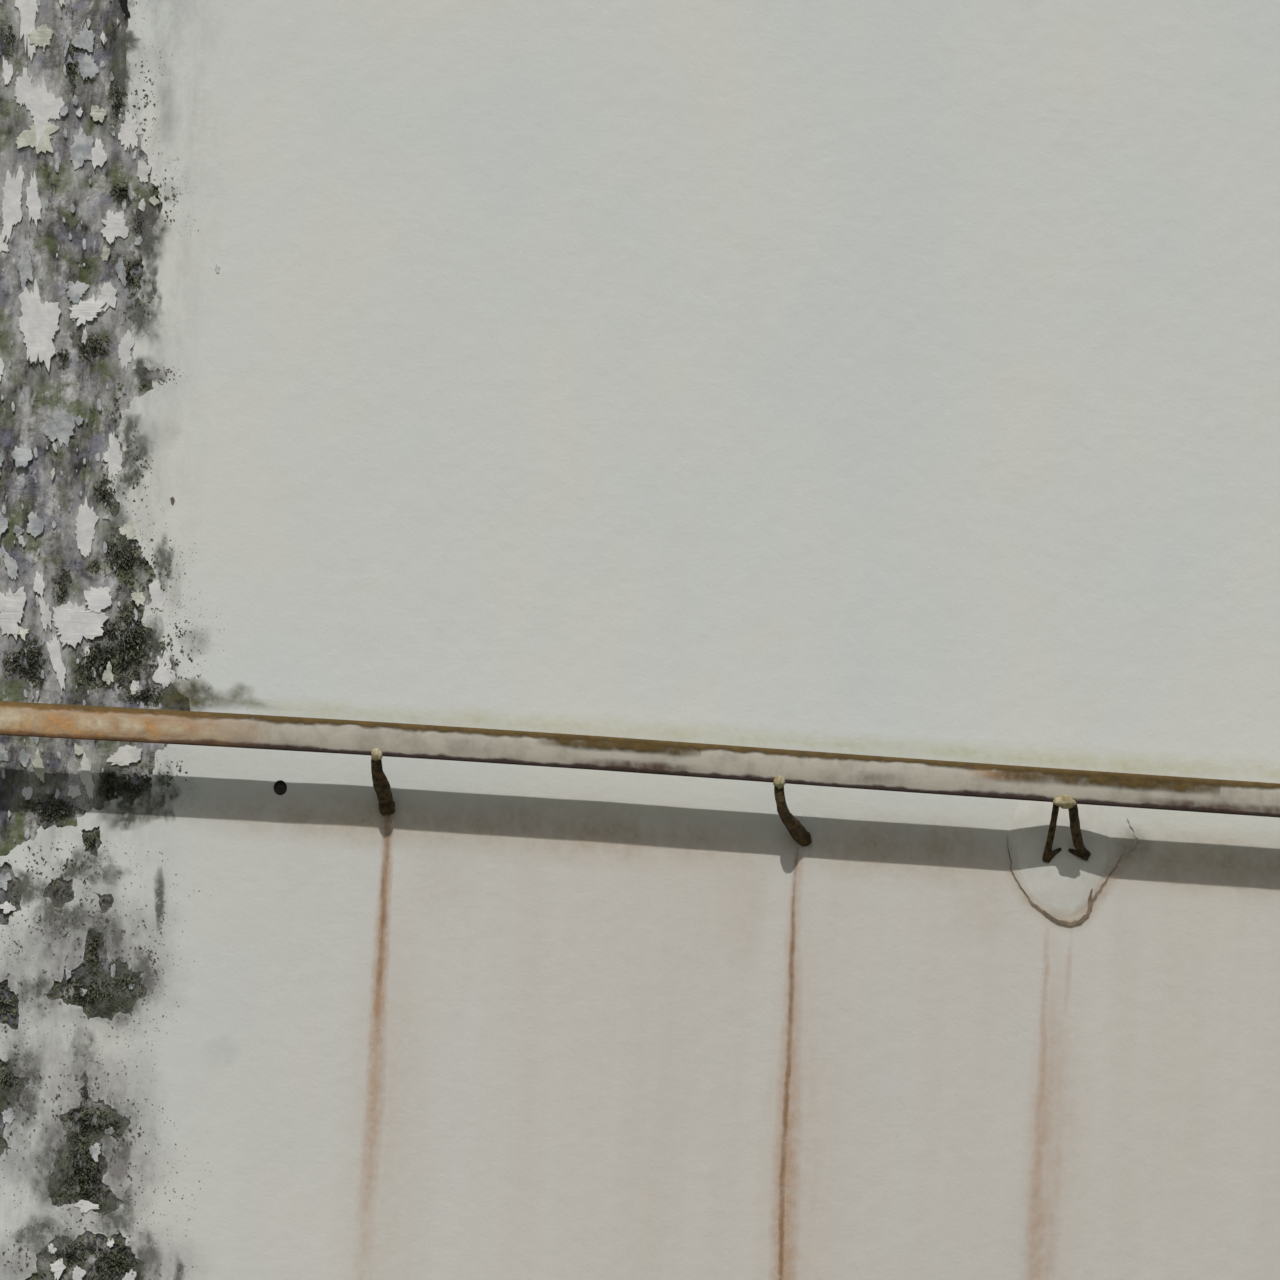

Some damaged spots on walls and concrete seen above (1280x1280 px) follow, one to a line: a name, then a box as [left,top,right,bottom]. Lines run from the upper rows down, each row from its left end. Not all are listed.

peeling [0,0,225,1280]
corrosion [0,701,1280,818]
corrosion [374,856,389,1041]
corrosion [779,1064,792,1280]